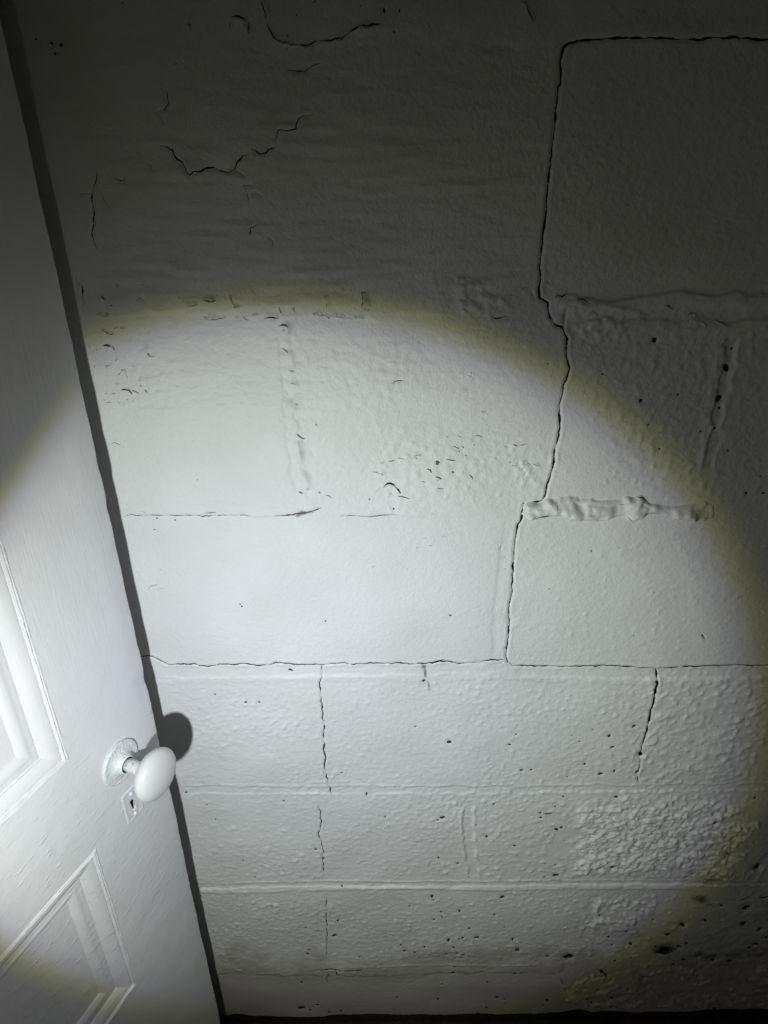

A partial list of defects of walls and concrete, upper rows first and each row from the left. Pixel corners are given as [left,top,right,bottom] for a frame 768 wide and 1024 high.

crack [84,176,125,249]
crack [125,35,768,981]